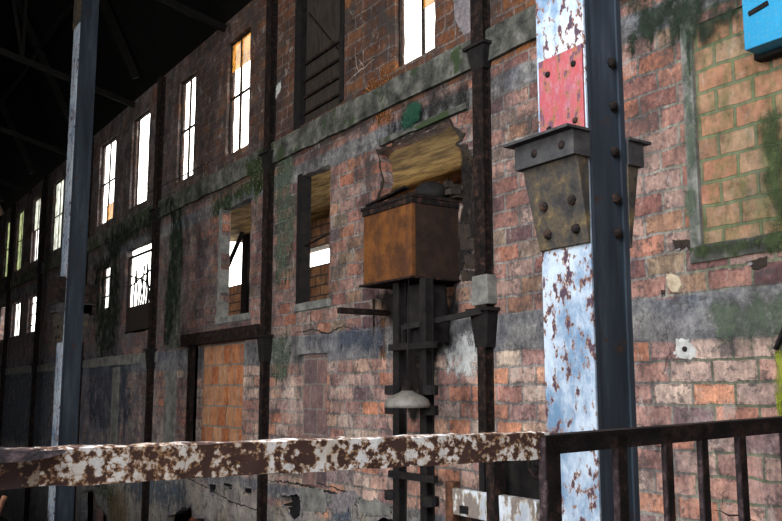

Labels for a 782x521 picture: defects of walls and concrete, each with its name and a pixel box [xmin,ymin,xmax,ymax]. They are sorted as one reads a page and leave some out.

spalling [376,118,473,199]
leakage [442,335,477,376]
spalling [673,338,696,360]
leakage [108,479,186,521]
peeling [277,487,393,521]